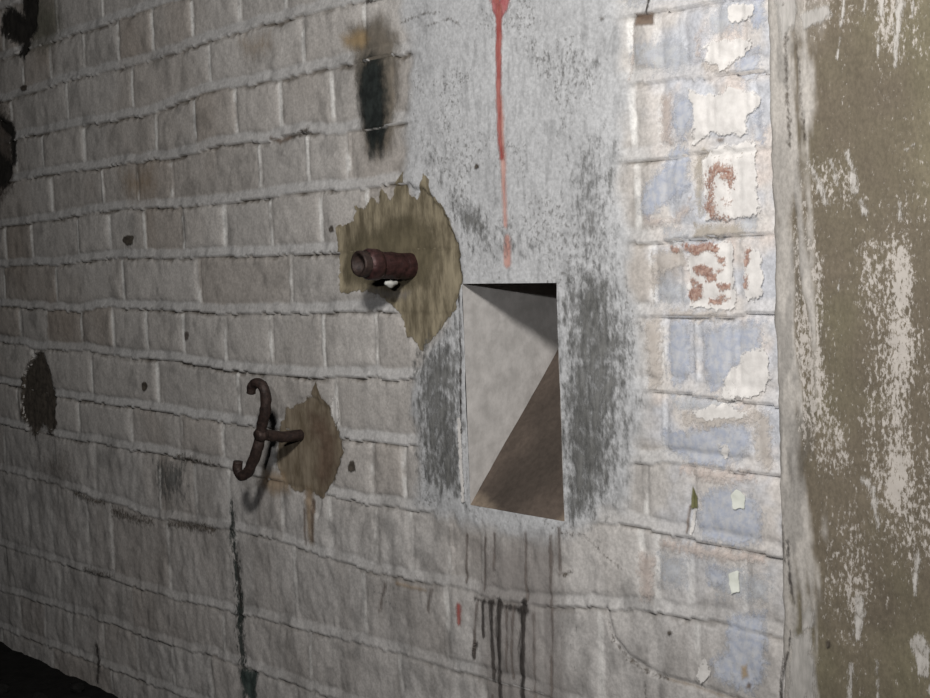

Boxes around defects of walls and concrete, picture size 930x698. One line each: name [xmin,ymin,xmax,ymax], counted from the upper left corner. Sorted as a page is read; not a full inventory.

peeling [775,0,830,40]
peeling [336,172,463,351]
leakage [572,150,612,237]
peeling [634,0,773,599]
peeling [263,382,344,540]
leakage [414,339,464,496]
leakage [558,249,631,523]
leakage [472,533,537,698]
leakage [549,527,561,638]
peeling [696,610,769,693]
peeling [787,608,816,698]